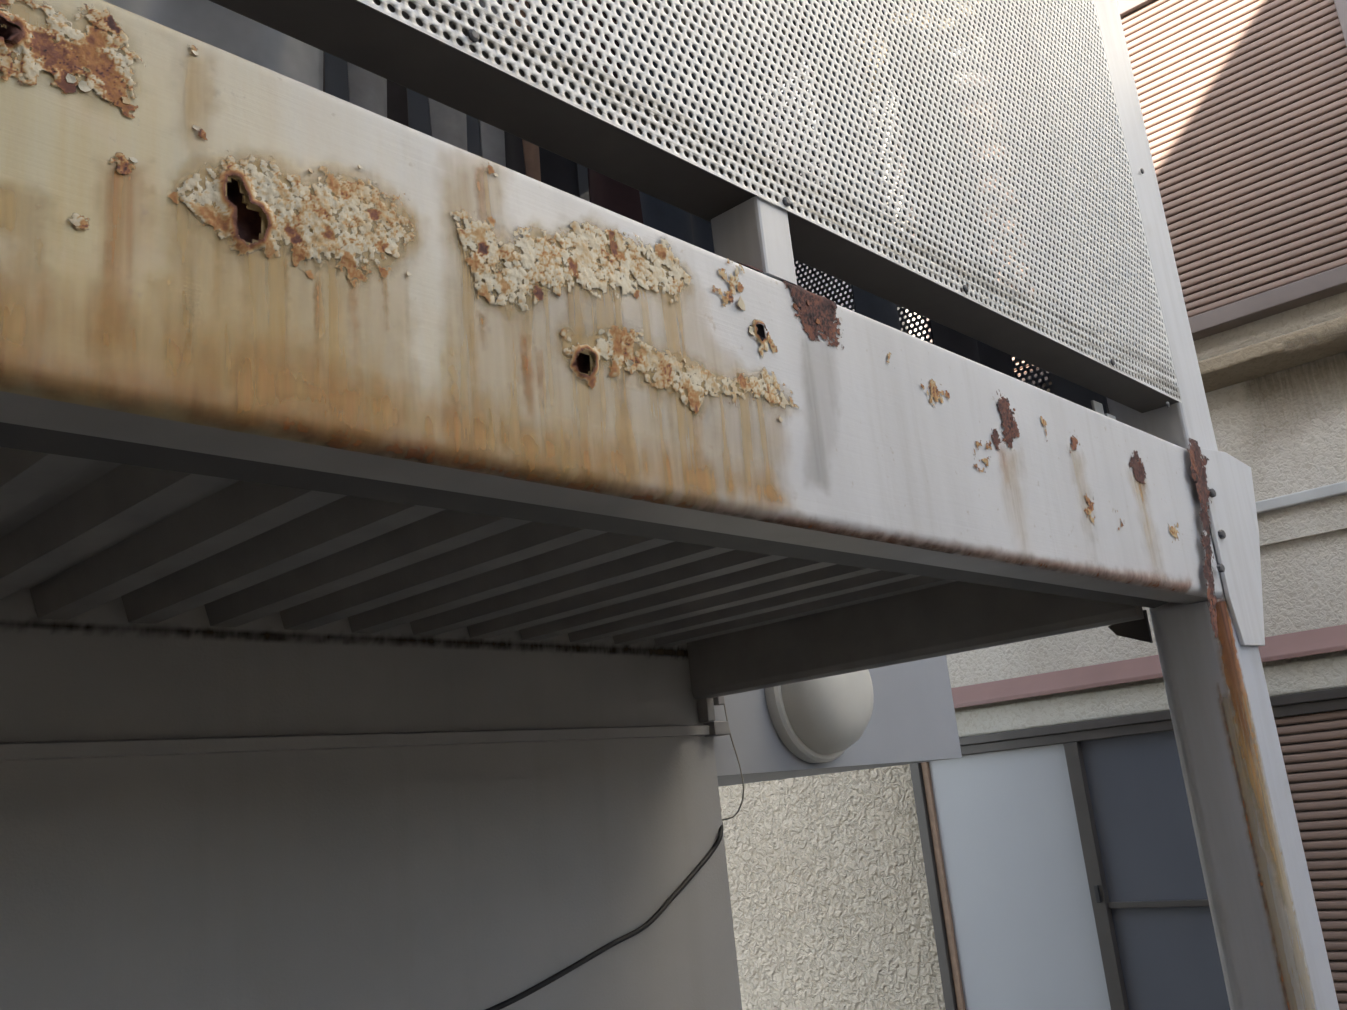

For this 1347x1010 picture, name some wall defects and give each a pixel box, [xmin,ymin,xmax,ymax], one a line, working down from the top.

peeling [0,0,145,118]
corrosion [107,152,138,281]
peeling [167,151,414,320]
peeling [450,170,692,311]
corrosion [659,282,686,363]
peeling [560,258,799,422]
corrosion [781,280,844,349]
corrosion [237,360,1067,571]
corrosion [1129,450,1146,497]
corrosion [1213,600,1312,1010]